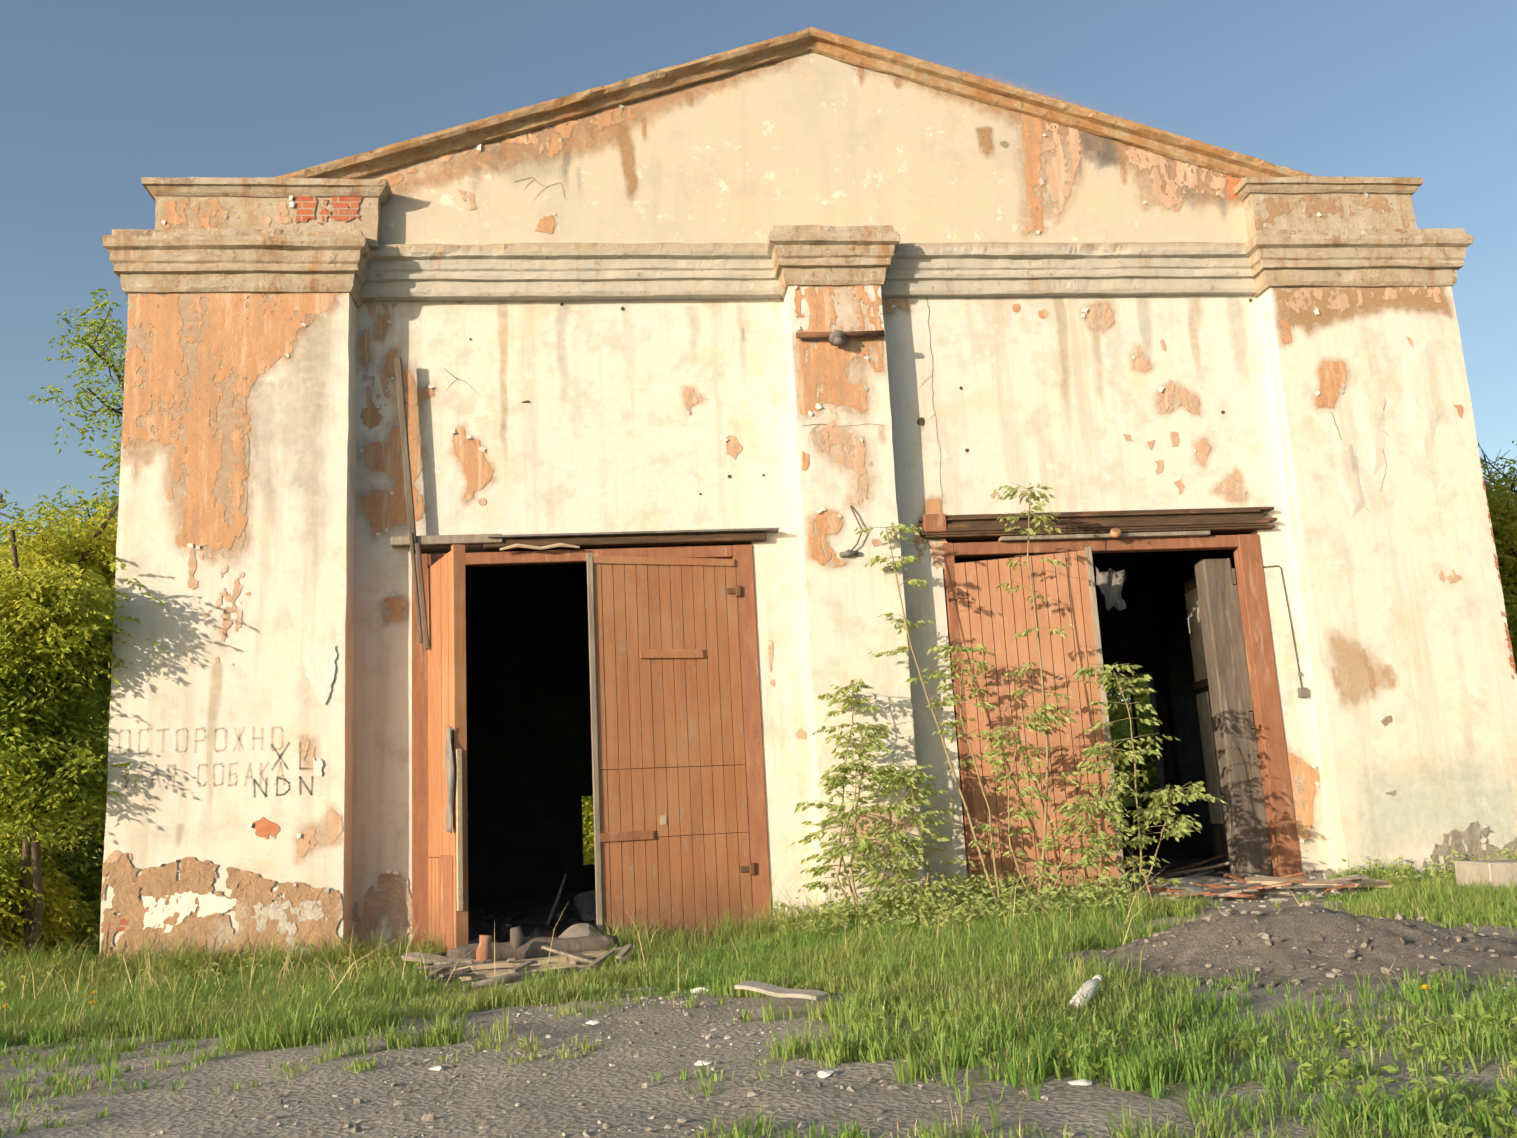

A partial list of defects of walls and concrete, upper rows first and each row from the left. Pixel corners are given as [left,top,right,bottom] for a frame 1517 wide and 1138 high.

peeling [505,104,635,159]
leakage [617,125,637,194]
peeling [1021,113,1082,234]
peeling [1125,145,1243,211]
peeling [1277,285,1442,343]
peeling [360,302,434,536]
peeling [793,285,909,567]
peeling [1315,360,1347,408]
peeling [122,293,338,666]
peeling [449,427,493,506]
spalling [1422,821,1517,879]
spalling [98,850,412,968]